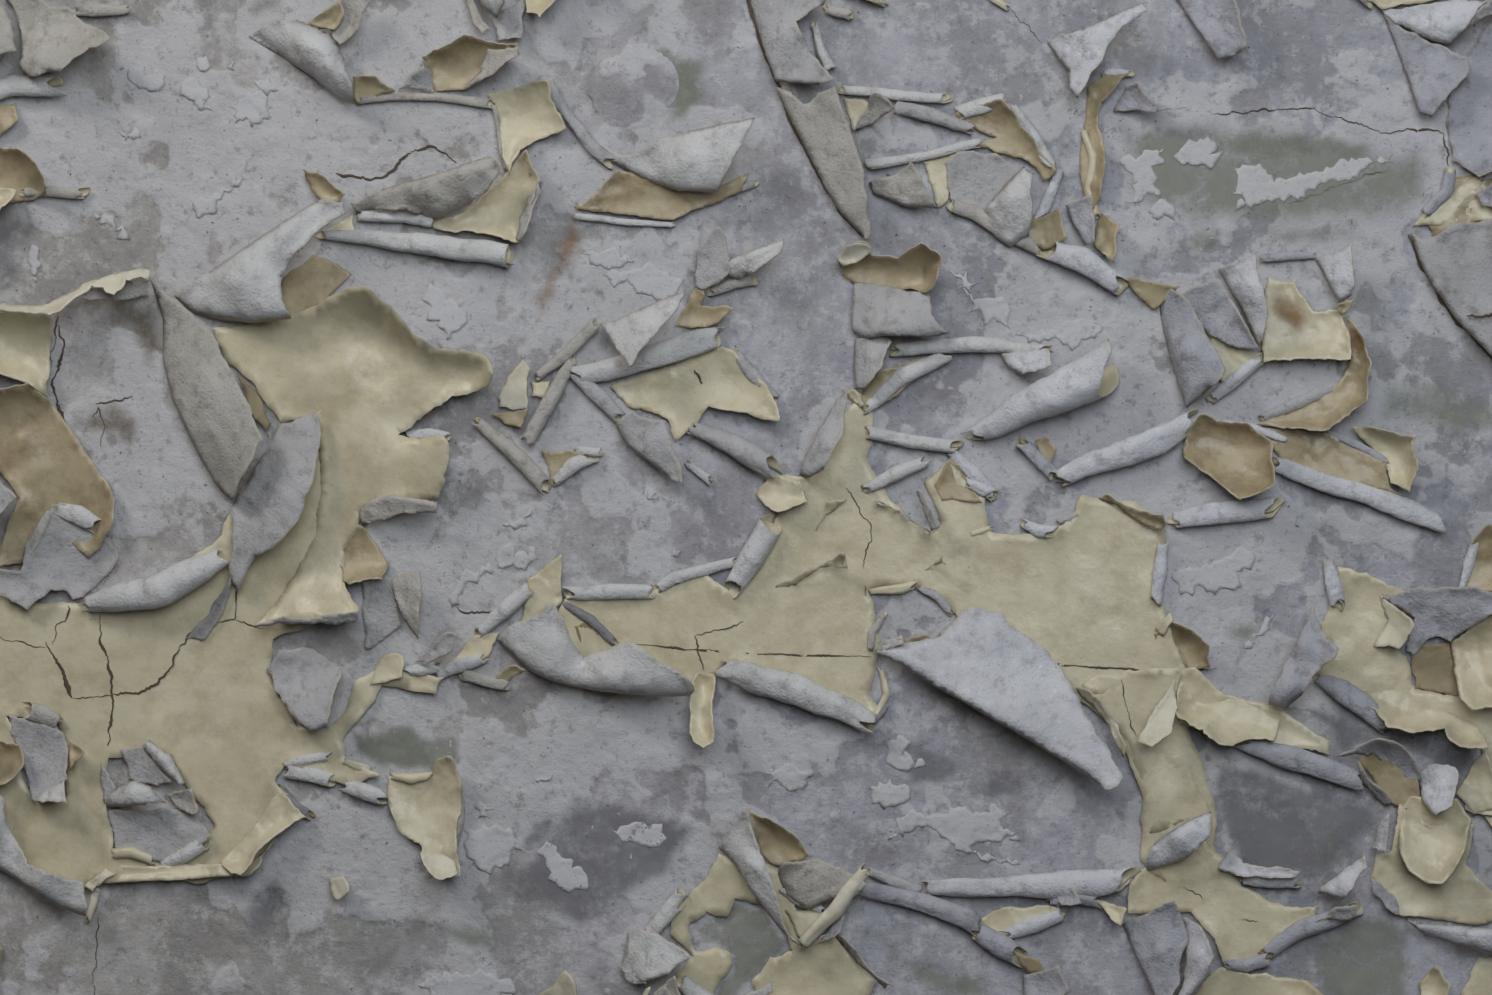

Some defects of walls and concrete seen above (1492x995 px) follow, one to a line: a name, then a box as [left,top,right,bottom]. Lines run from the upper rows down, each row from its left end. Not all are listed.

crack [336,145,456,181]
crack [1216,107,1450,165]
crack [1290,171,1386,204]
peeling [0,0,760,649]
peeling [370,0,1492,995]
crack [846,488,872,596]
crack [0,591,263,748]
peeling [267,647,342,732]
crack [638,621,870,670]
crack [1057,663,1139,735]
peeling [0,701,589,924]